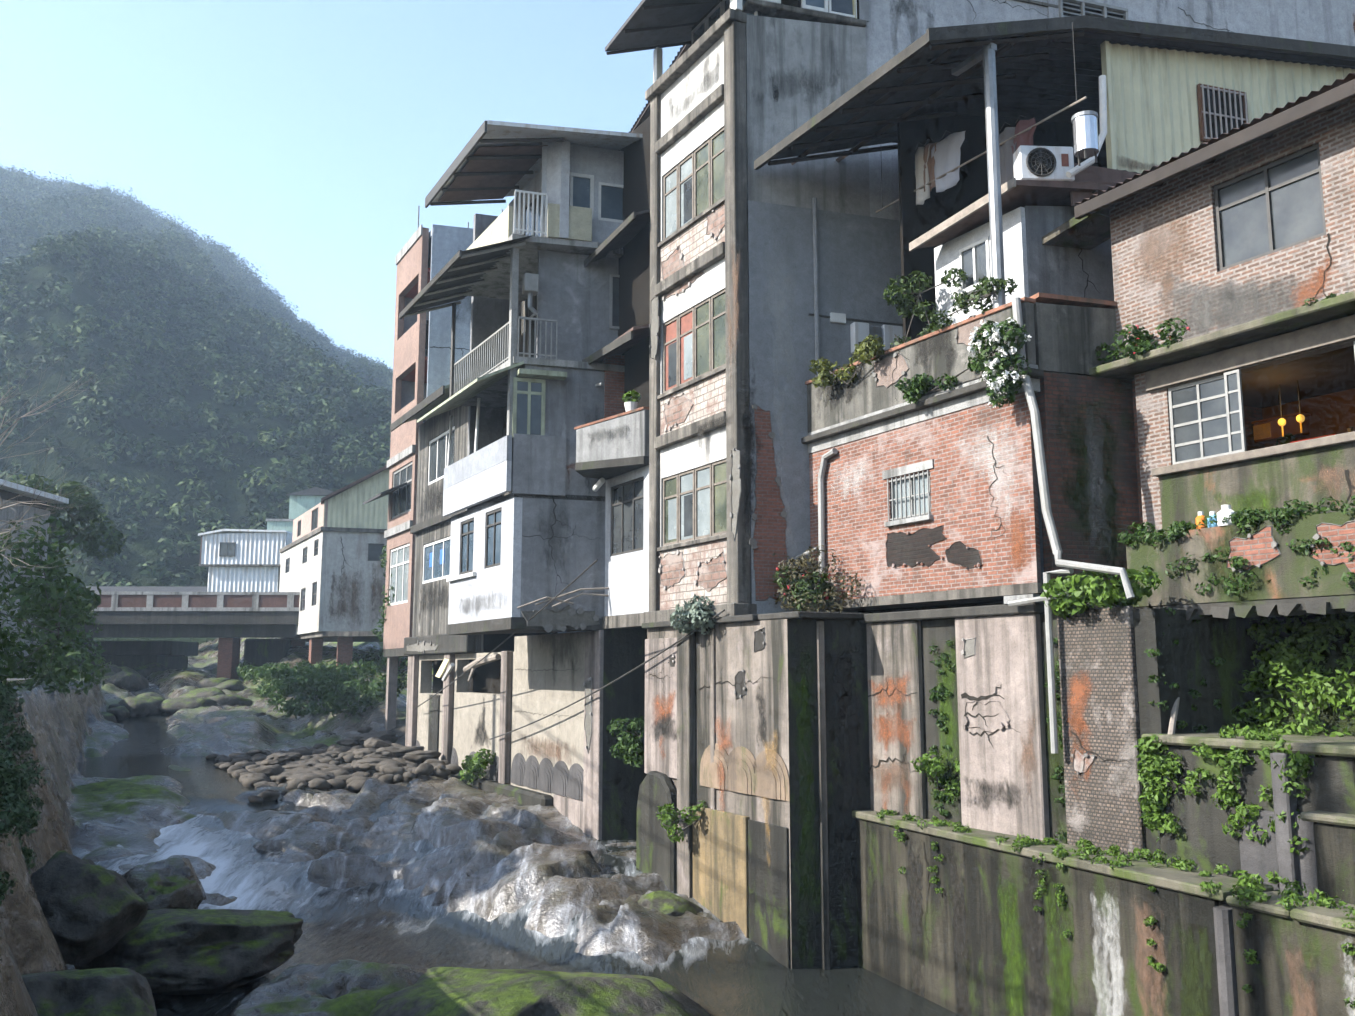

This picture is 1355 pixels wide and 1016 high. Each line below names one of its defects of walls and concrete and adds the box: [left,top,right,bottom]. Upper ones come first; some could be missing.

peeling [706,202,725,240]
peeling [649,245,704,360]
peeling [872,352,910,389]
peeling [658,404,788,601]
crack [987,436,1004,560]
spalling [885,525,983,569]
spalling [1227,526,1281,573]
spalling [1309,520,1355,574]
rust [655,696,673,722]
rust [872,679,910,744]
crack [961,686,1020,747]
rust [1070,675,1089,732]